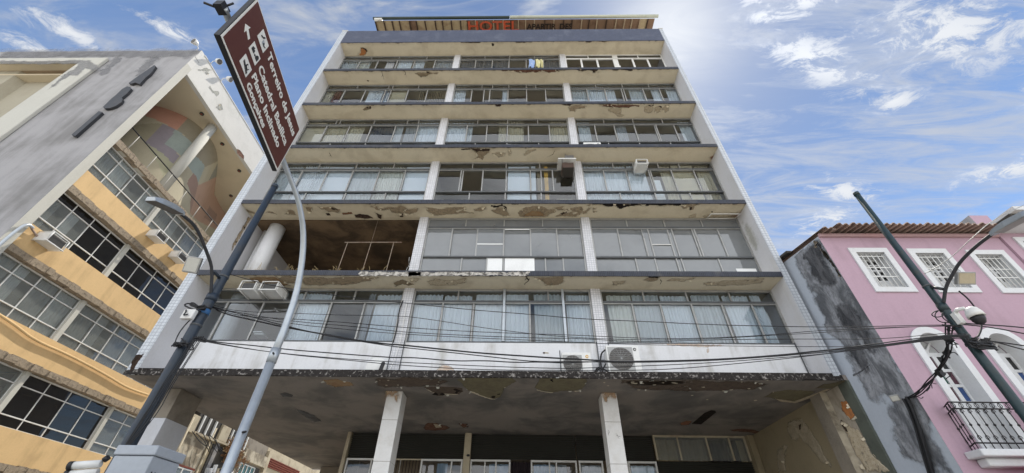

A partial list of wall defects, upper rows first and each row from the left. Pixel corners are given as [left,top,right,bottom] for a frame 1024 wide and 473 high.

peeling [603,104,669,117]
spalling [461,148,511,160]
peeling [268,203,700,219]
peeling [250,276,375,286]
peeling [394,278,466,286]
damp [765,240,952,473]
spalling [123,354,163,376]
spalling [176,370,844,401]
peeling [840,401,889,473]